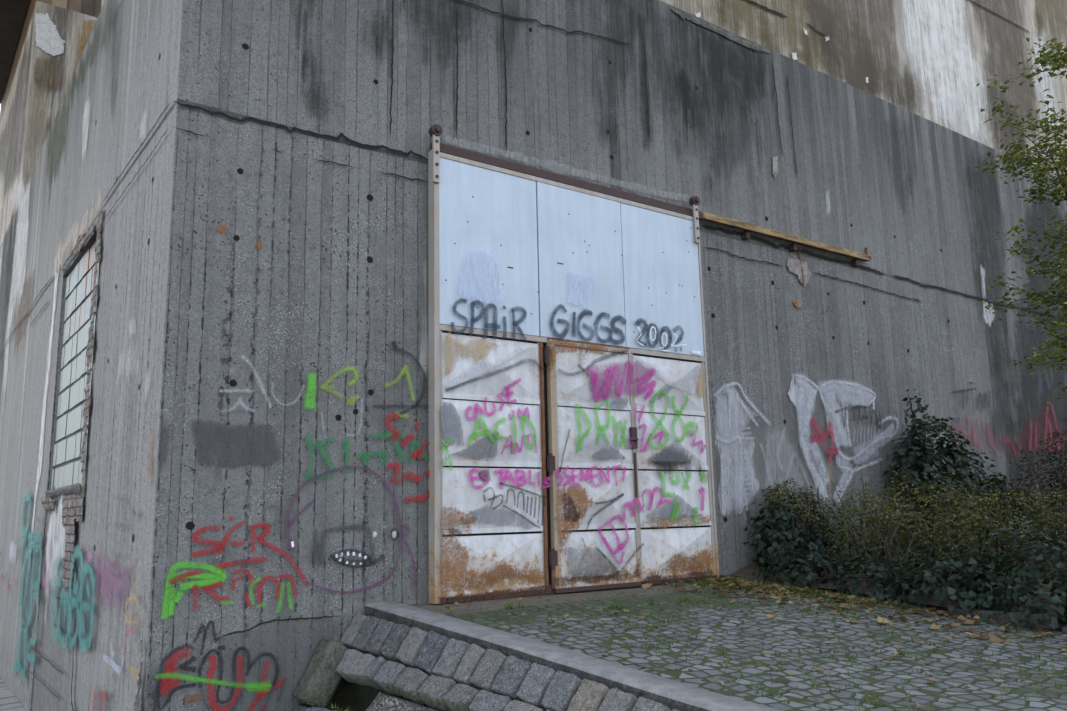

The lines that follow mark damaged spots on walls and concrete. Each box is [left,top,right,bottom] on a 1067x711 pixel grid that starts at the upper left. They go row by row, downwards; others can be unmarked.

crack [103,0,428,219]
leakage [701,0,1066,155]
leakage [0,182,30,383]
spalling [40,209,103,587]
crack [702,225,1066,319]
leakage [967,161,1067,503]
corrosion [555,485,593,553]
corrosion [439,507,714,604]